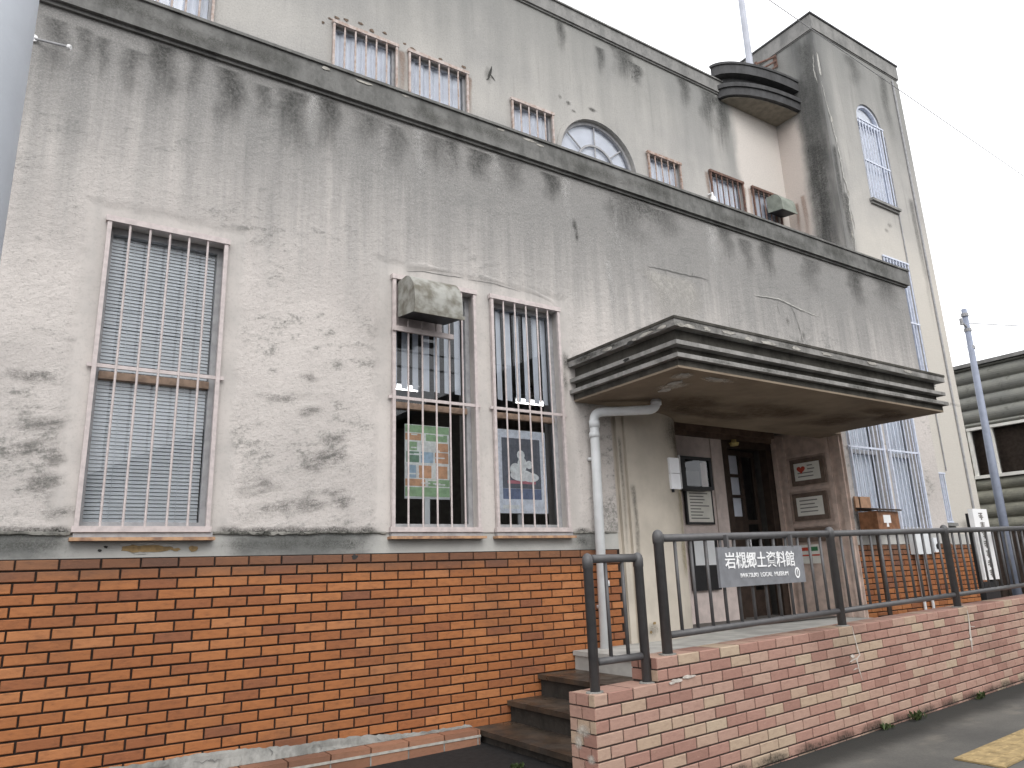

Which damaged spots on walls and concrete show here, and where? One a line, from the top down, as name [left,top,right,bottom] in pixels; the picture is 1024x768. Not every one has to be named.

crack [648,266,707,280]
crack [755,295,820,341]
peeling [98,542,198,554]
crack [849,628,863,680]